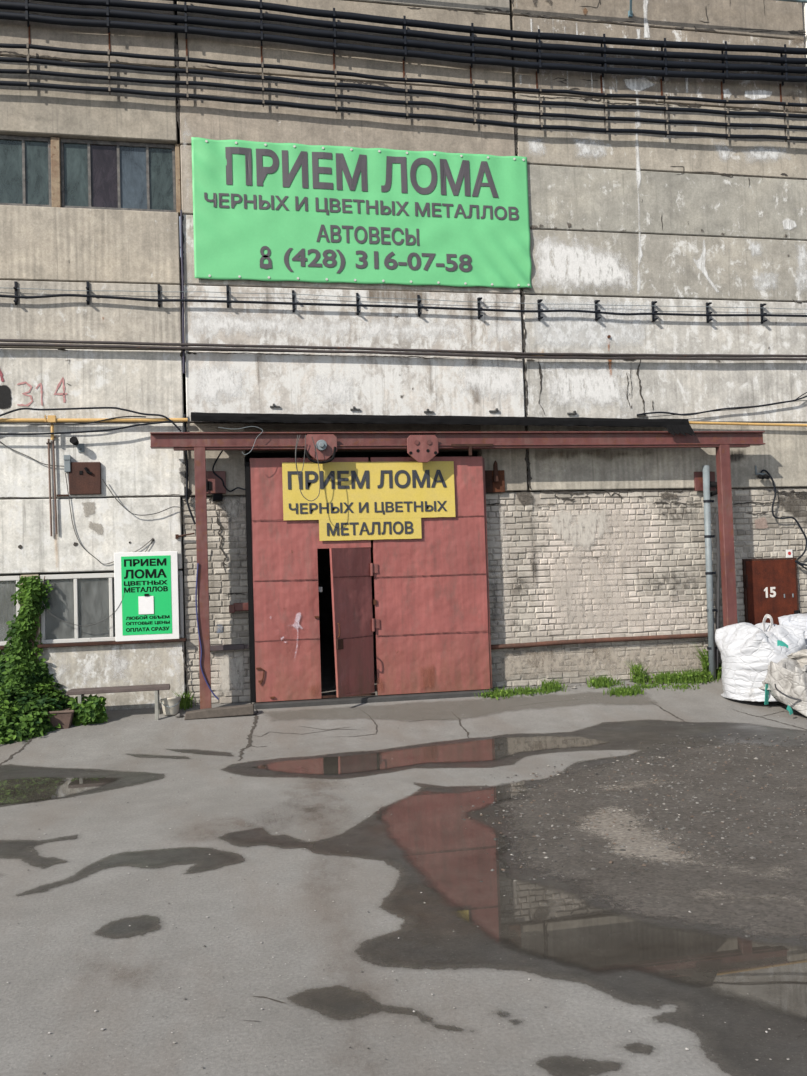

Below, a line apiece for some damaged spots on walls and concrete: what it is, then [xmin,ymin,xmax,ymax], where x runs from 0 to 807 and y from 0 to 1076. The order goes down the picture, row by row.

damp [637,0,649,39]
damp [591,73,653,210]
damp [535,301,651,347]
crack [625,360,654,413]